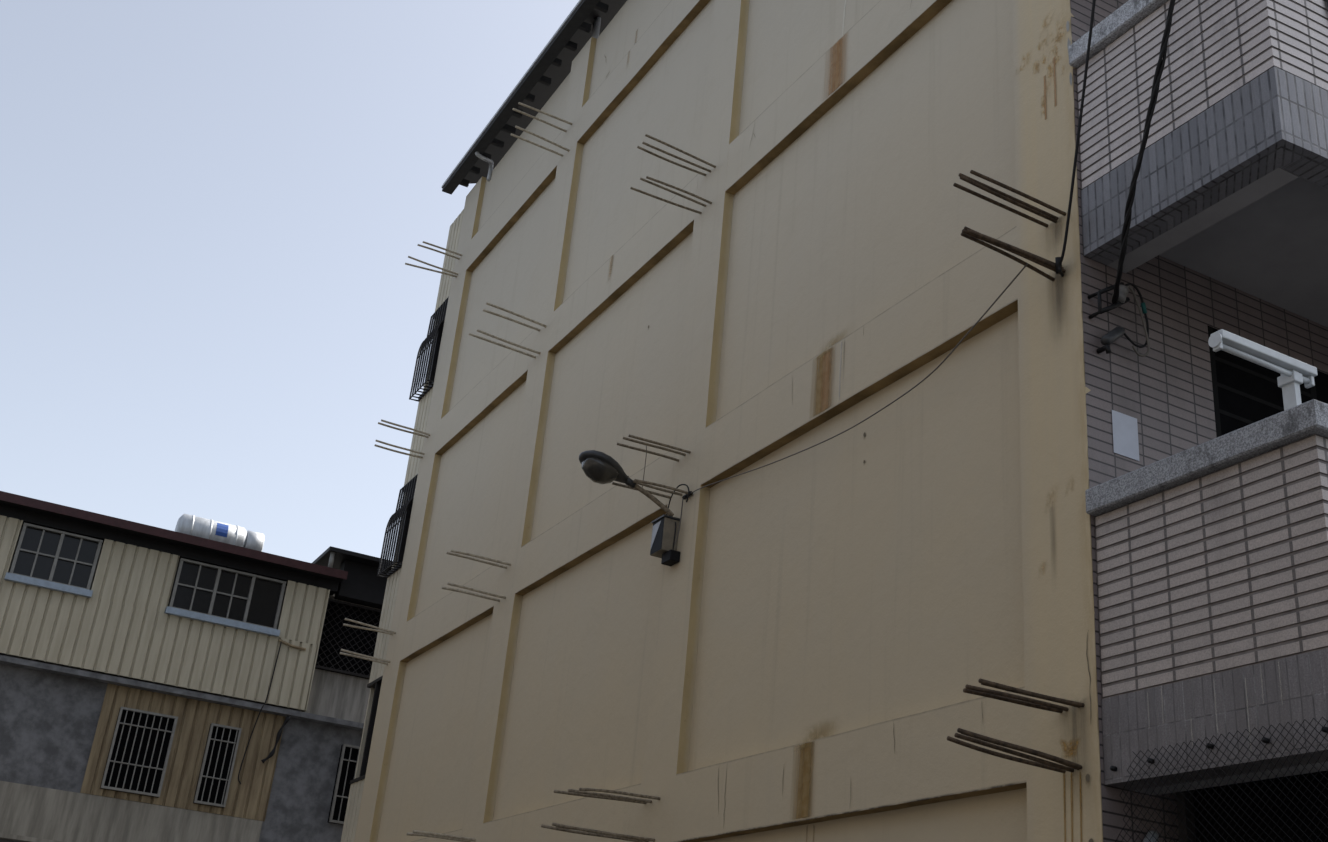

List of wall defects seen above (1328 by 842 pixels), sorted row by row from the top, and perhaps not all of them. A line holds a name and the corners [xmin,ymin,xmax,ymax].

rust [829,37,843,95]
rust [814,349,830,416]
rust [795,742,812,819]